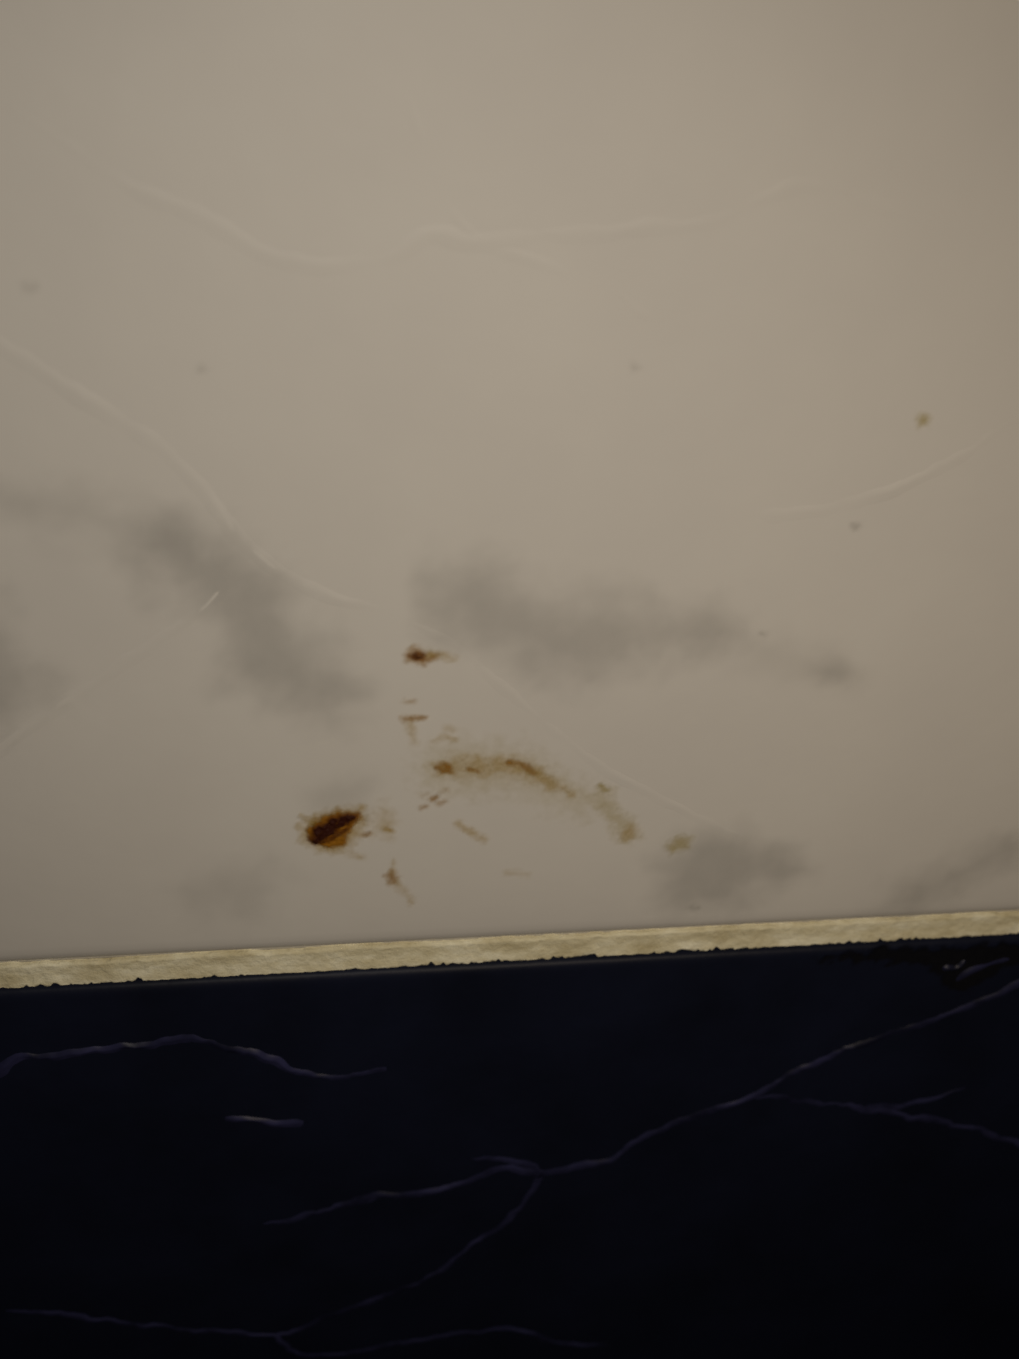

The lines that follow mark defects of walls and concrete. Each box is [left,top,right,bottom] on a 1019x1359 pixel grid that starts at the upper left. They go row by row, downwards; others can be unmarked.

corrosion [407,651,436,663]
corrosion [435,763,452,773]
corrosion [306,811,361,848]
crack [0,979,1019,1357]